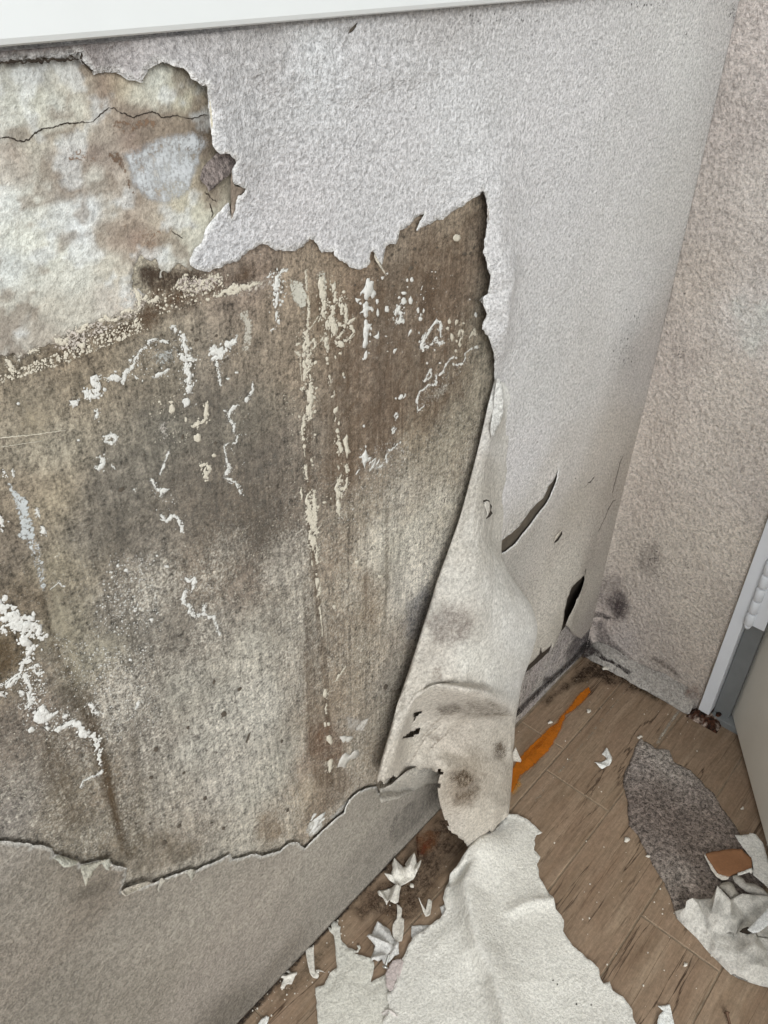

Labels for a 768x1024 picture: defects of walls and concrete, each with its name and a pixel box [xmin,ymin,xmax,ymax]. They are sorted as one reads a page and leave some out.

crack [2,107,205,142]
peeling [0,52,241,372]
damp [136,266,220,325]
peeling [206,269,288,330]
peeling [70,325,209,442]
peeling [199,385,254,494]
peeling [295,247,478,637]
damp [316,235,469,483]
peeling [0,599,104,788]
damp [79,695,171,856]
peeling [323,667,359,772]
damp [450,770,478,799]